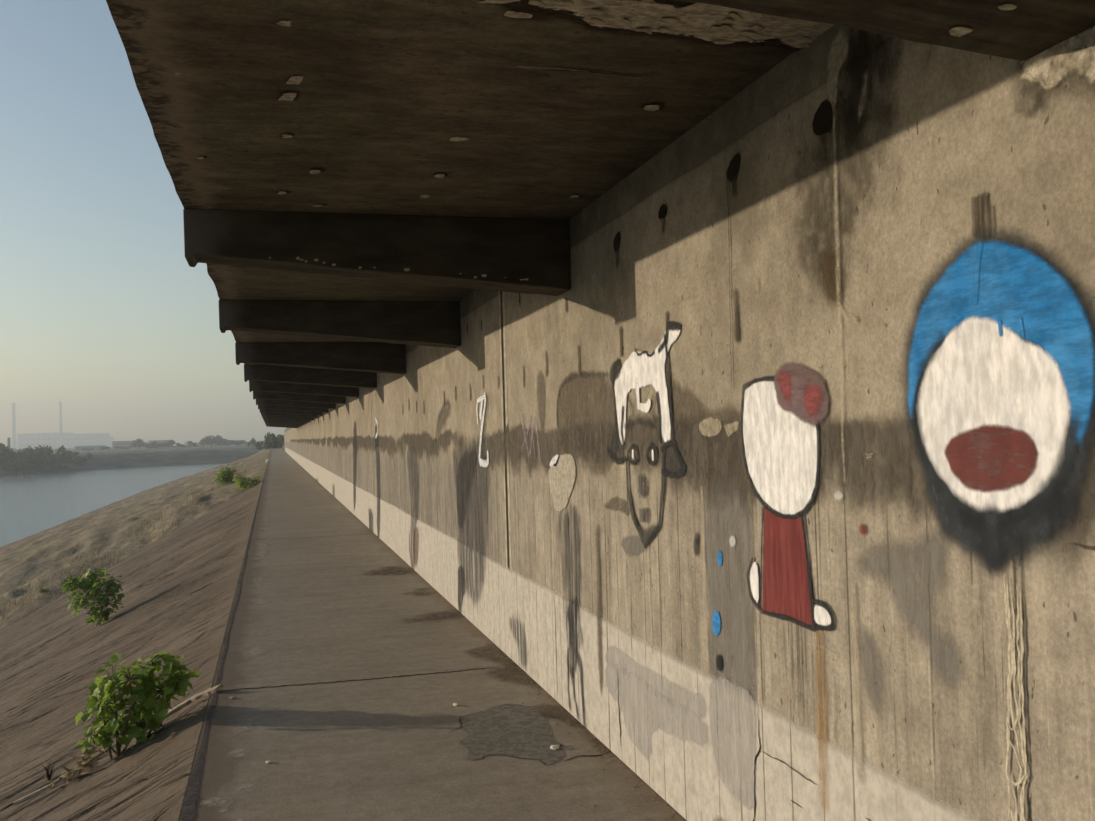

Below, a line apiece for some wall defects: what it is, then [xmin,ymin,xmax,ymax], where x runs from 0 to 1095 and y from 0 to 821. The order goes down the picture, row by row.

peeling [478,0,834,51]
water stain [800,29,899,326]
crack [1068,542,1095,550]
efflorescence [1003,560,1029,821]
crack [753,704,817,821]